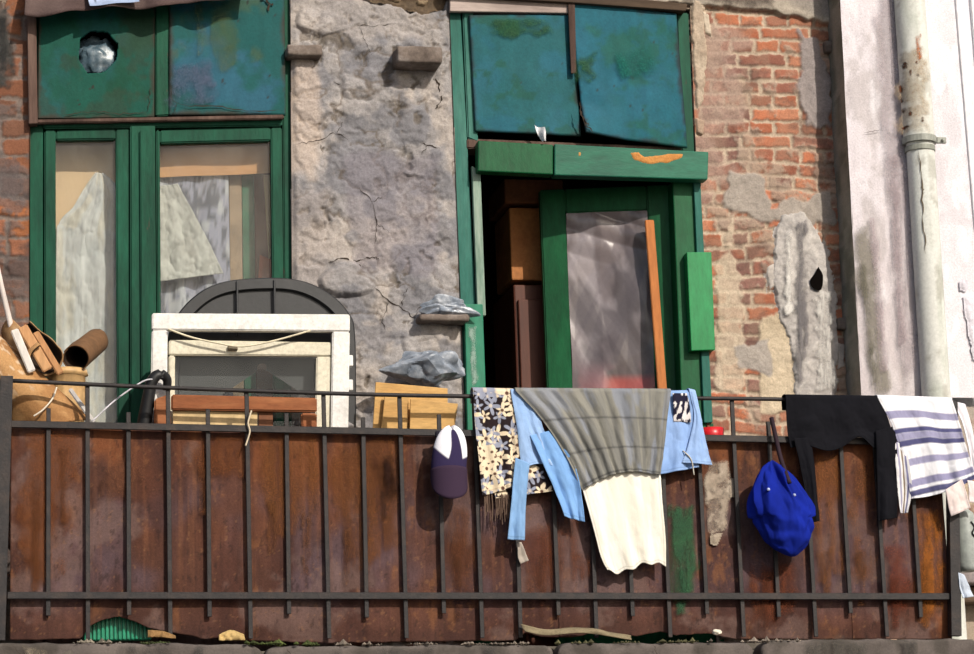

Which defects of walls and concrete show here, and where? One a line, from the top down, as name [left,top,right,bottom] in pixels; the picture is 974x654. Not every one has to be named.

flaking render [689,0,712,136]
flaking render [763,211,845,395]
rust [10,428,952,643]